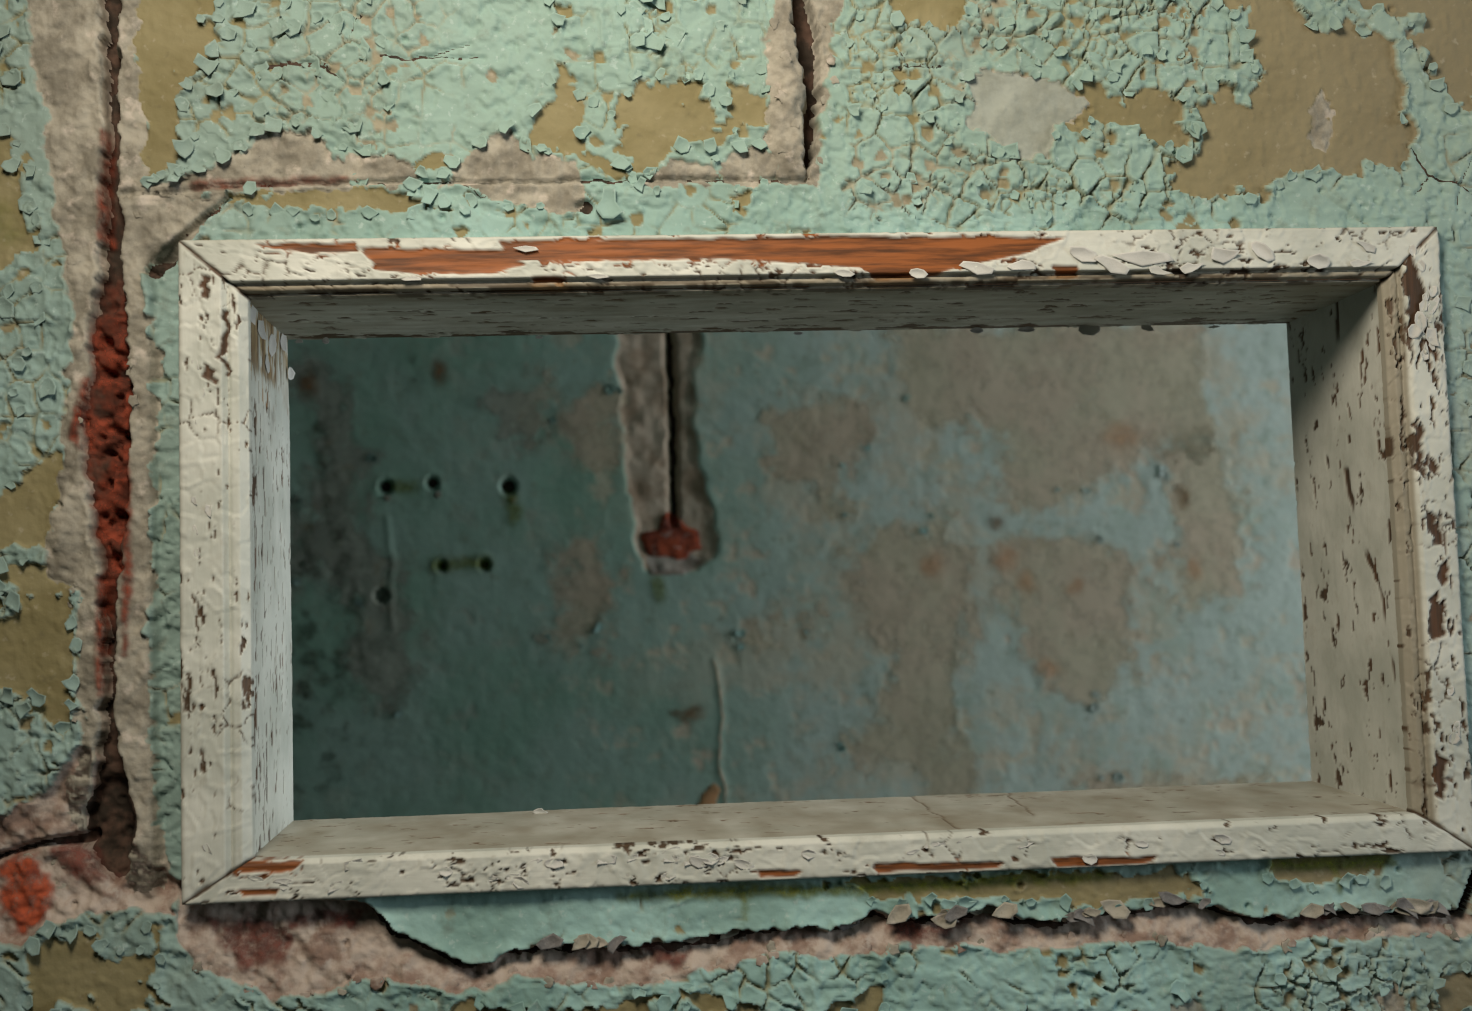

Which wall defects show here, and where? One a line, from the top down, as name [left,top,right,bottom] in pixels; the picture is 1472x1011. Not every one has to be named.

peeling [0,0,58,445]
peeling [133,0,778,222]
peeling [909,268,928,278]
peeling [959,259,1036,275]
peeling [1069,246,1204,275]
peeling [832,0,1472,224]
peeling [1307,253,1331,269]
peeling [1408,244,1472,425]
peeling [0,451,84,736]
corrosion [70,313,134,689]
spalling [0,746,1472,1011]
crack [1449,870,1472,913]